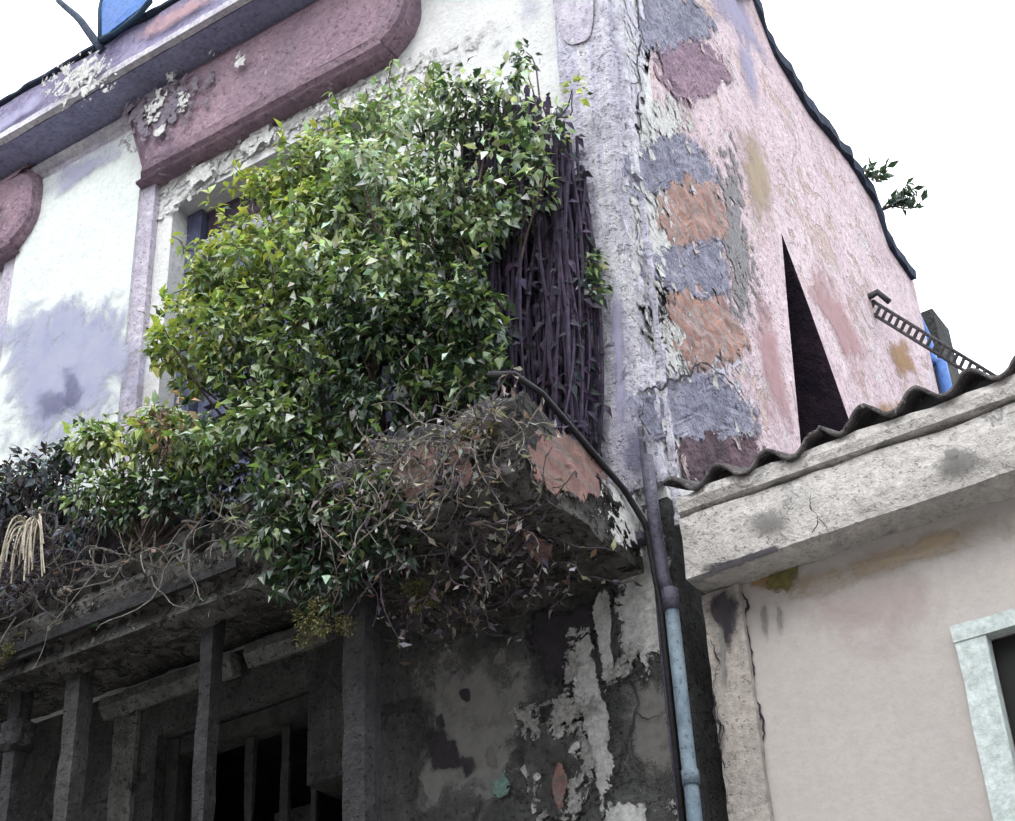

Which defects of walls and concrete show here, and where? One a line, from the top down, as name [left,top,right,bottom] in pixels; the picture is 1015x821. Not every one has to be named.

flaking render [42,50,119,110]
peeling [108,69,217,153]
flaking render [157,19,510,220]
flaking render [616,0,772,481]
water stain [0,295,141,456]
water stain [939,448,975,473]
water stain [749,511,783,530]
flaking render [509,429,687,821]
water stain [710,591,738,681]
crack [742,593,755,676]
water stain [761,606,781,633]
crack [757,702,765,740]